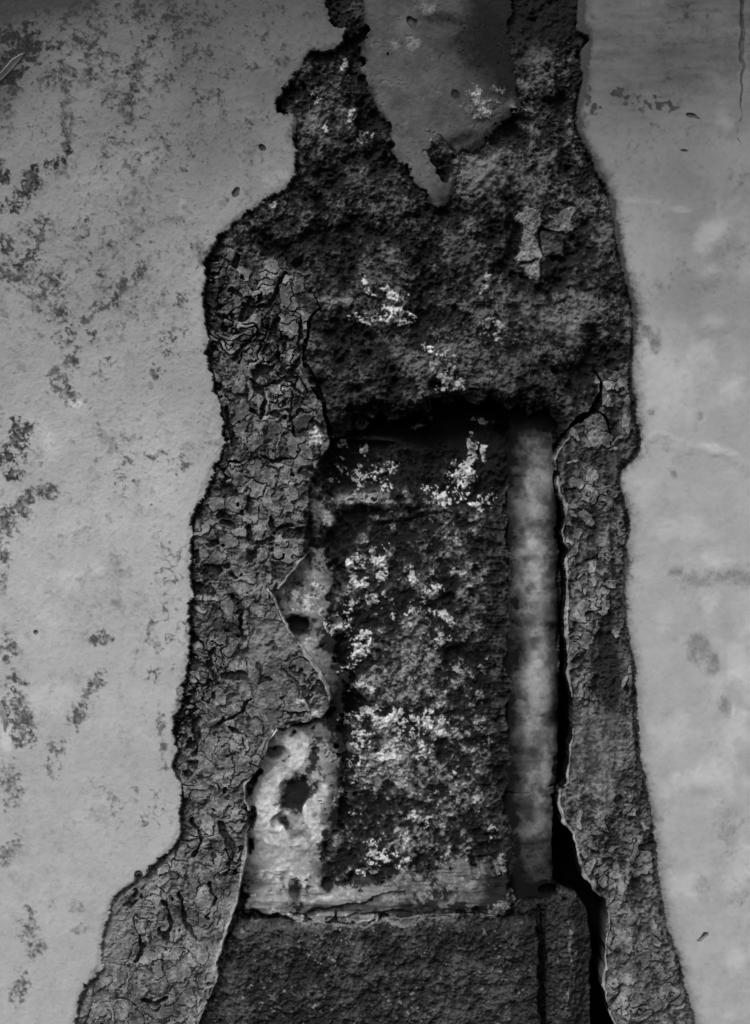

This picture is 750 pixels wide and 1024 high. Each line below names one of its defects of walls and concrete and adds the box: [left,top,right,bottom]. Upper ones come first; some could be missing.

damp [0,22,118,84]
damp [0,117,72,213]
damp [0,218,96,401]
damp [0,416,33,481]
crack [302,290,334,445]
damp [329,439,397,491]
flaking render [215,0,695,1024]
damp [421,417,497,512]
crack [557,371,612,442]
peeling [75,246,331,1024]
damp [323,543,494,777]
damp [356,811,506,903]